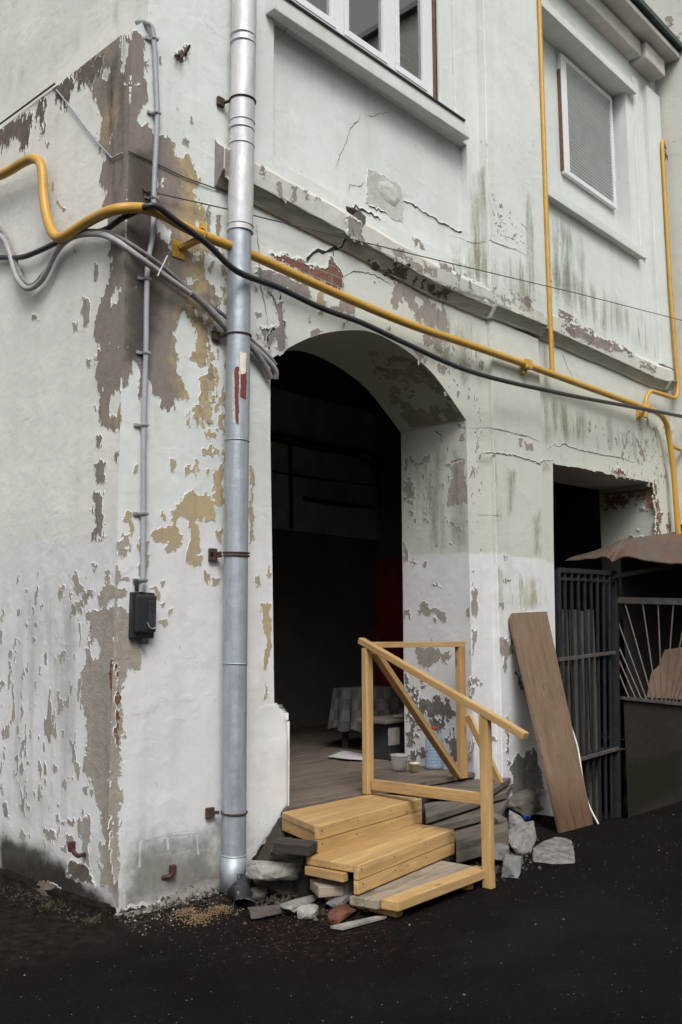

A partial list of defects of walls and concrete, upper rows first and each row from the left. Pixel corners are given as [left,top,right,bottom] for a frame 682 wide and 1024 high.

crack [337,112,524,254]
flaking render [253,250,355,356]
peeling [344,213,535,568]
peeling [558,309,657,379]
peeling [0,30,227,907]
crack [435,427,634,465]
flaking render [588,419,675,538]
peeling [254,565,272,589]
peeling [259,601,272,700]
peeling [404,600,447,624]
peeling [404,647,475,764]
peeling [492,714,548,799]